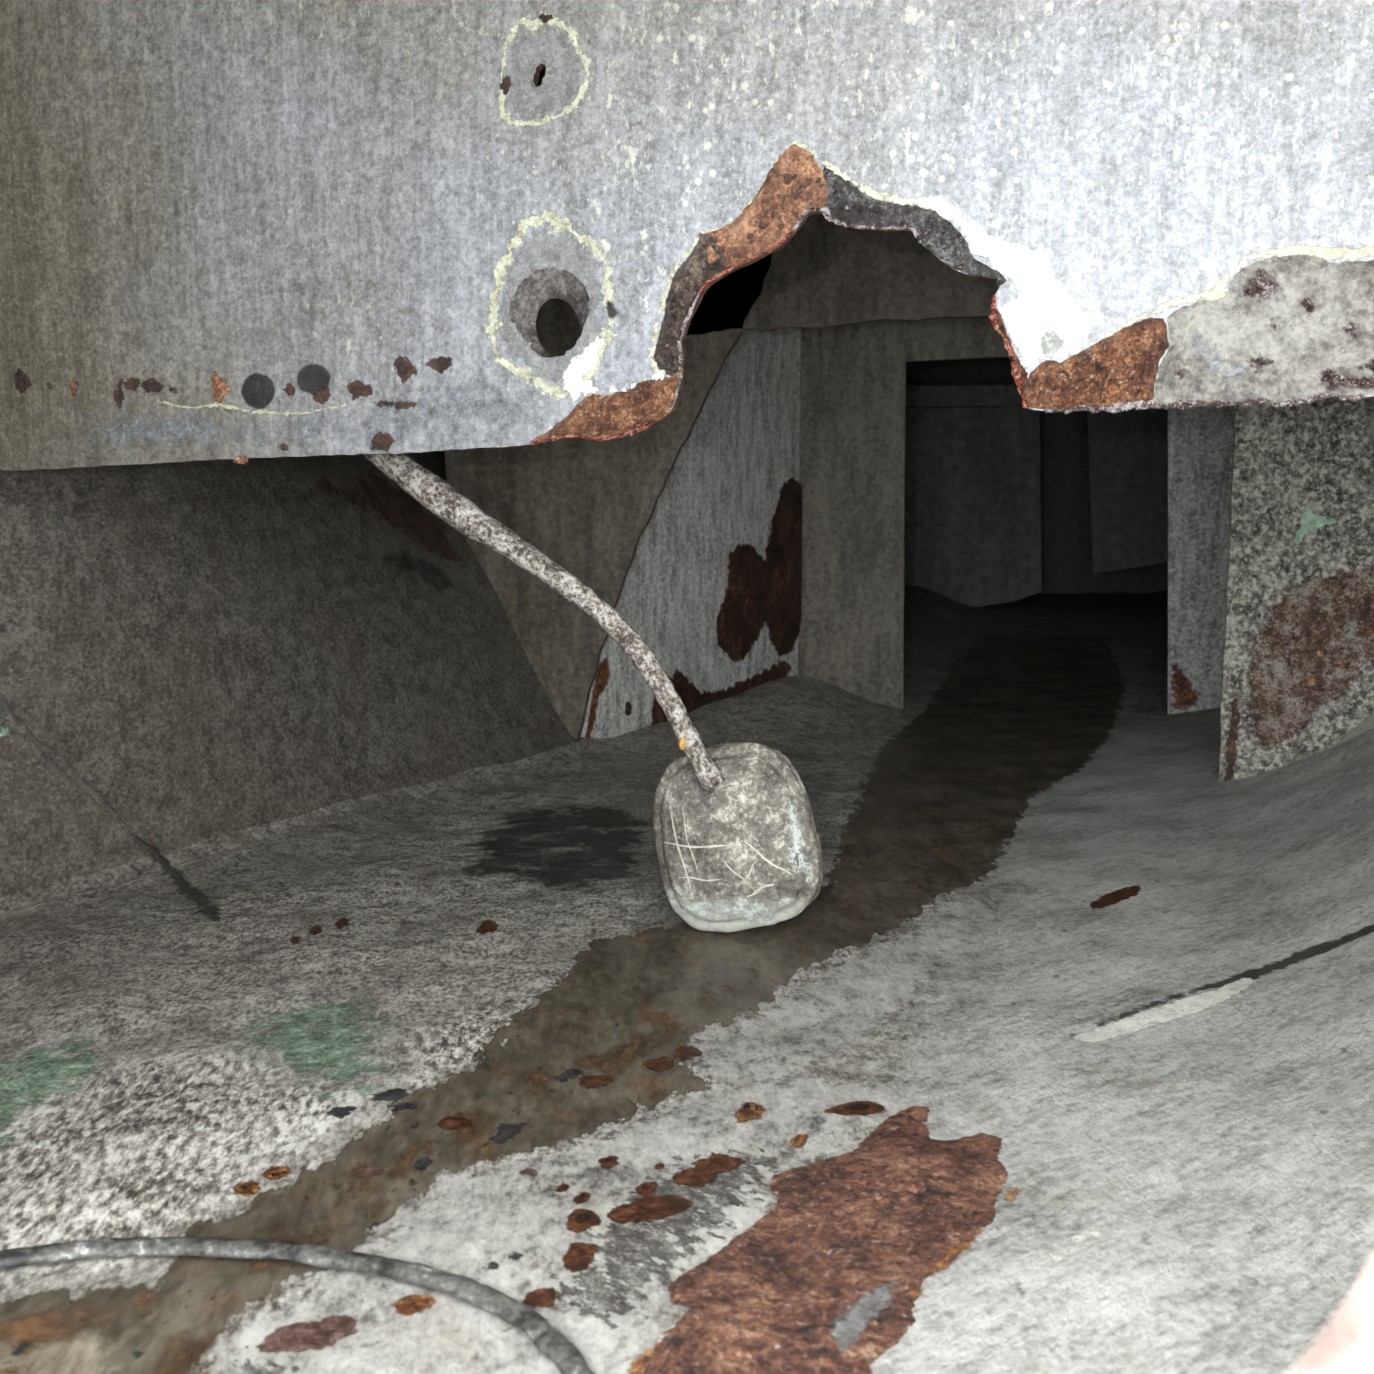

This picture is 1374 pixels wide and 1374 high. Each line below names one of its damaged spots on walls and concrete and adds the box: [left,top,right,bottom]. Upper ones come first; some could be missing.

peeling [562,141,1374,401]
corrosion [651,697,668,725]
corrosion [669,478,803,713]
corrosion [1223,568,1374,781]
leakage [184,635,1128,1250]
leakage [0,1256,328,1374]
corrosion [628,1101,1022,1374]